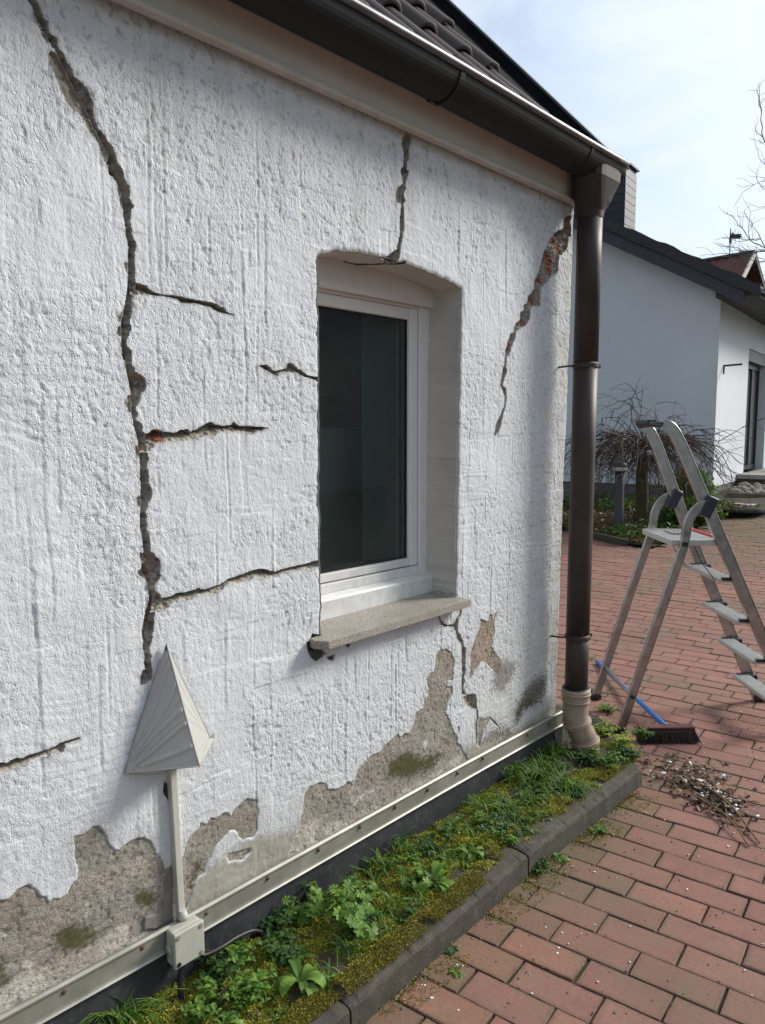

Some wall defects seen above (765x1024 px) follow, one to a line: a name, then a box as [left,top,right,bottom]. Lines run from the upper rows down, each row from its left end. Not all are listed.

crack [344,133,411,265]
crack [28,0,319,685]
crack [494,215,571,436]
flaking render [307,633,335,661]
peeling [469,613,500,678]
crack [0,737,81,772]
peeling [288,649,467,858]
peeling [477,719,488,746]
peeling [0,799,258,1014]